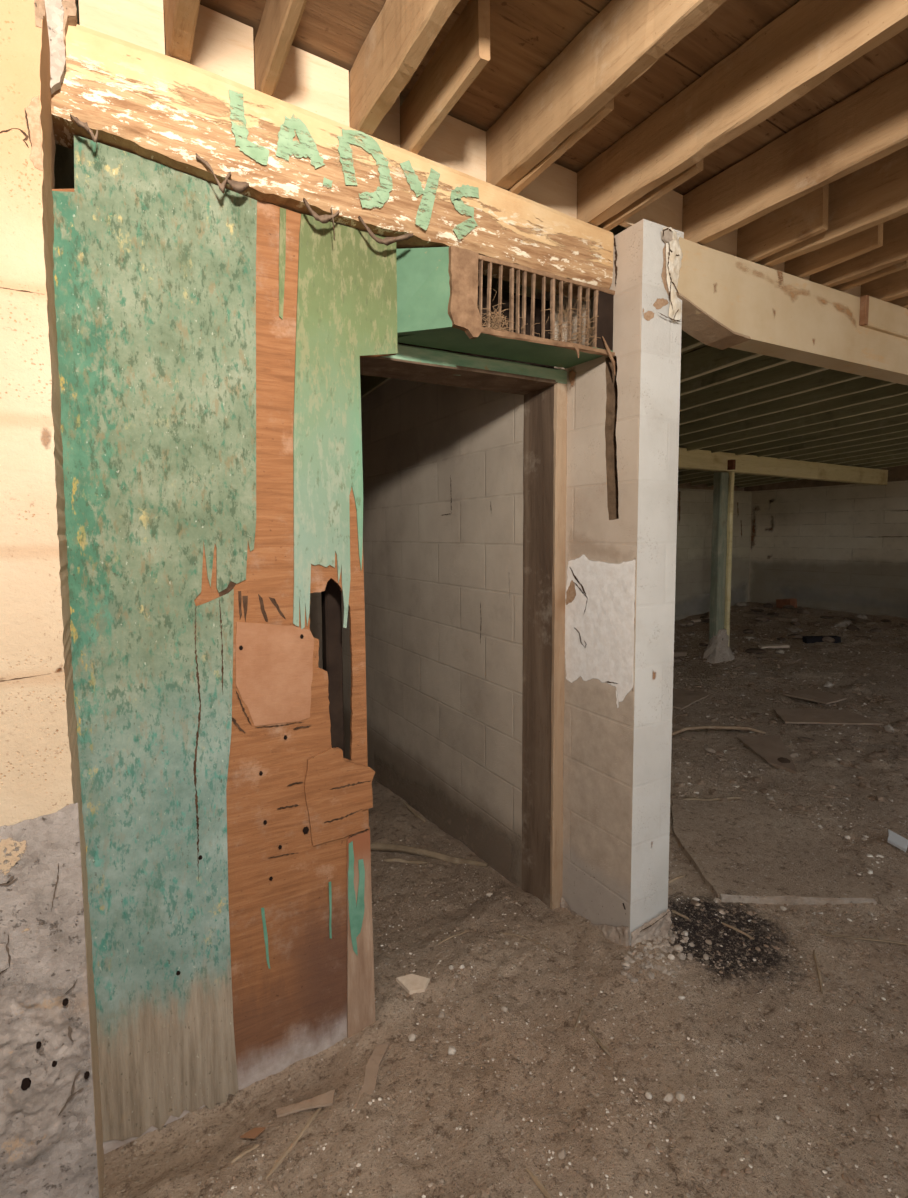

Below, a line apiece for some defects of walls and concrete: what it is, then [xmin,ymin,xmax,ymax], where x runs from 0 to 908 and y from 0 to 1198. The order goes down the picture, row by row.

crack [0,128,29,148]
peeling [565,554,635,708]
peeling [0,803,99,1198]